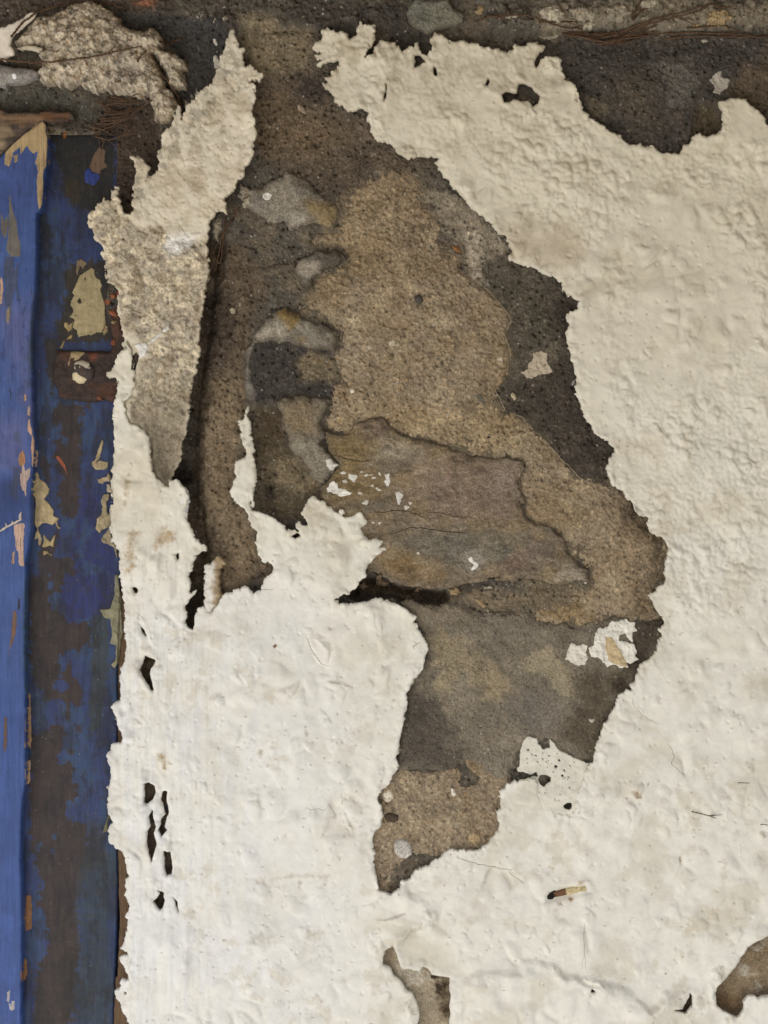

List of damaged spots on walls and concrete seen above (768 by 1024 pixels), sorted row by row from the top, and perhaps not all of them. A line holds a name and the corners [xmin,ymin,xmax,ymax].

flaking render [0,0,188,210]
peeling [0,189,21,324]
peeling [64,268,106,337]
peeling [0,394,61,566]
spalling [84,0,768,893]
peeling [8,599,20,654]
peeling [23,895,32,931]
flaking render [154,890,178,909]
spalling [383,946,451,1024]
spalling [715,937,768,1016]